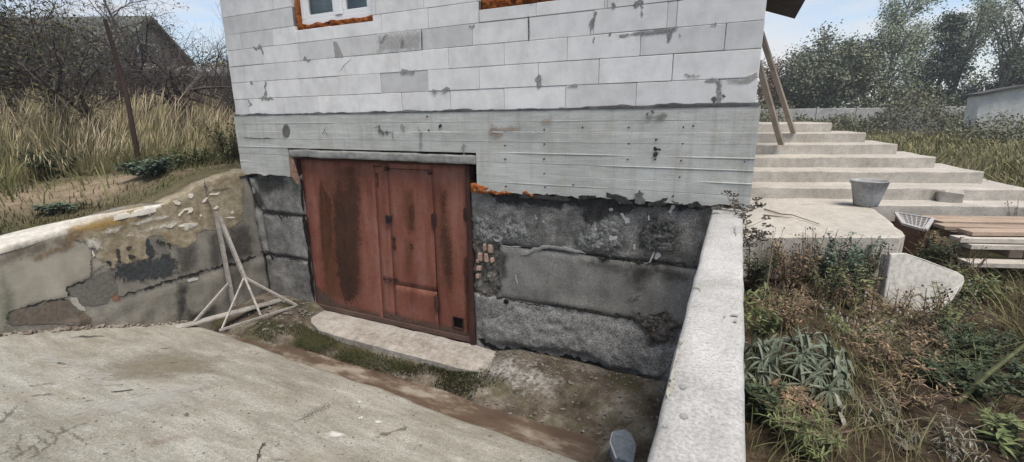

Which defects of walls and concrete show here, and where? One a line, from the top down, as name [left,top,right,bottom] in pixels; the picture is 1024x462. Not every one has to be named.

peeling [8,173,244,337]
crack [120,177,315,301]
rust [316,187,469,336]
spalling [520,190,706,263]